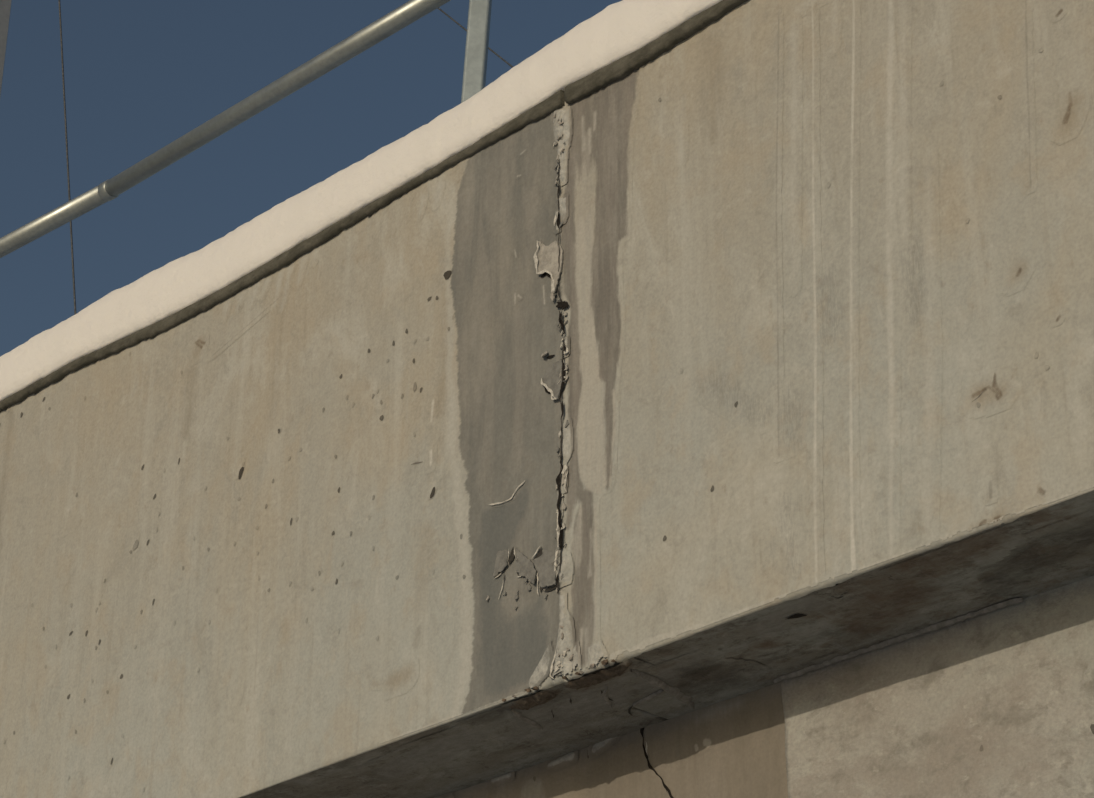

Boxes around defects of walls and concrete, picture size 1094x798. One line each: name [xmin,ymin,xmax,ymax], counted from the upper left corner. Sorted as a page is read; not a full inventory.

water stain [220,245,321,325]
water stain [414,65,645,729]
peeling [541,351,563,400]
crack [555,119,568,594]
spalling [379,478,1094,744]
crack [601,691,674,798]